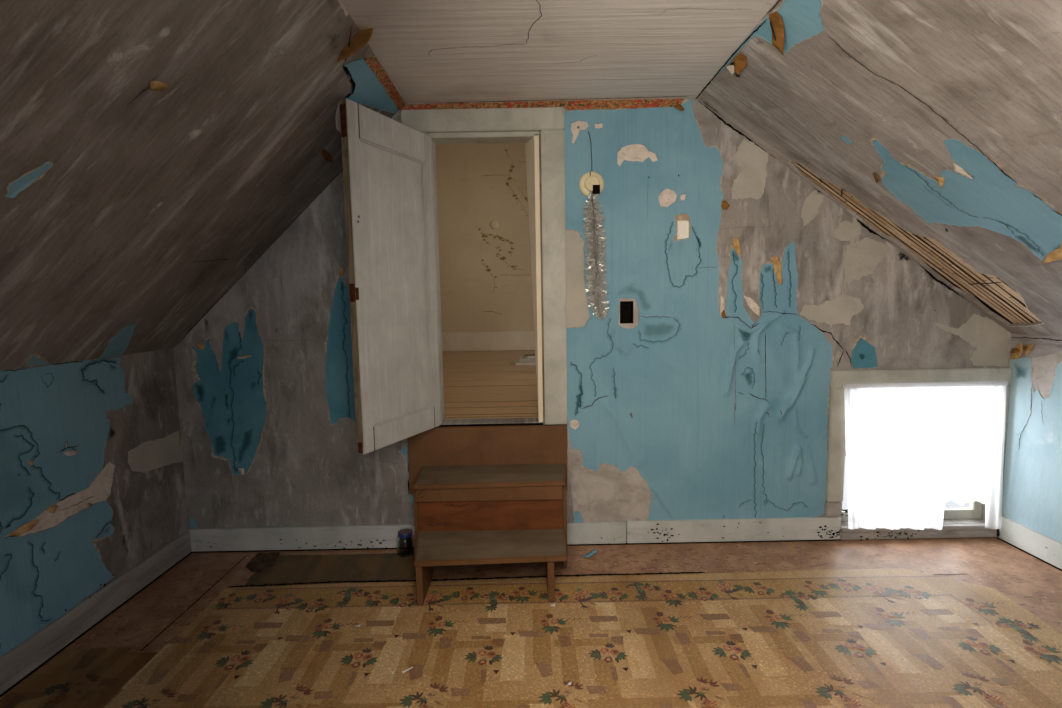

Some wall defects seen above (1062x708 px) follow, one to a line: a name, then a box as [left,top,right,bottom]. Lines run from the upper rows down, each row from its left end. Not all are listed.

crack [428,0,542,53]
peeling [935,163,973,188]
peeling [1043,243,1062,264]
flaking render [1010,342,1062,398]
peeling [9,504,57,536]